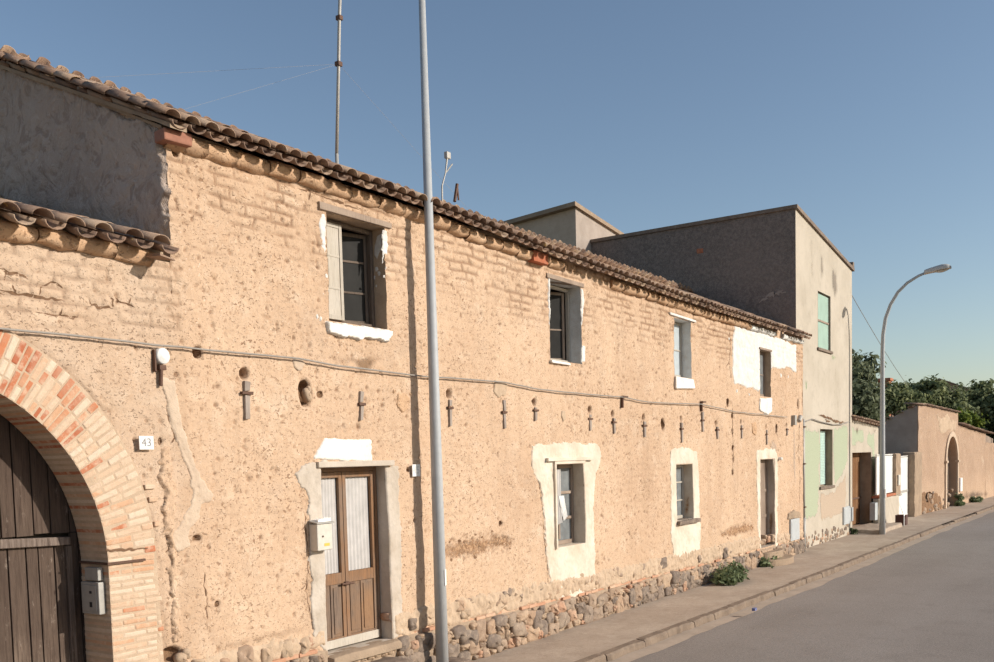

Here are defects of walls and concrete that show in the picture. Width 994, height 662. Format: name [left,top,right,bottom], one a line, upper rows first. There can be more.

crack [0,268,134,320]
peeling [726,326,797,407]
spalling [445,521,511,562]